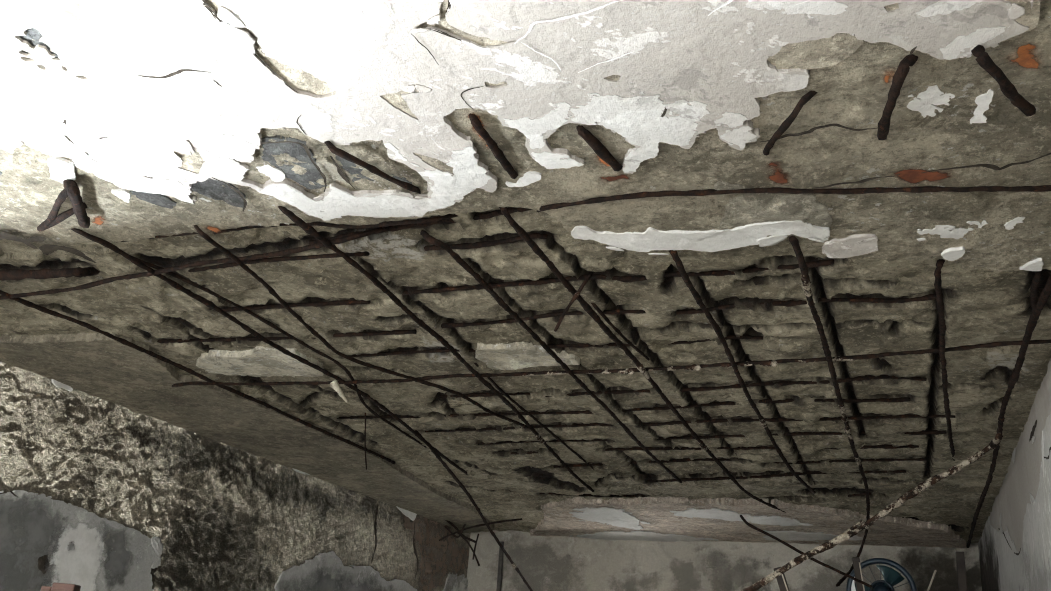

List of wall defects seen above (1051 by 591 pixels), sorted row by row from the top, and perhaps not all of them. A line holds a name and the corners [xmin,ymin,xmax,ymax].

rust [324,141,421,194]
spalling [0,0,1051,368]
rust [576,125,630,182]
rust [877,54,918,140]
rust [971,43,1039,116]
water stain [0,494,133,591]
peeling [0,362,471,591]
water stain [126,428,469,591]
spalling [0,207,1021,532]
rust [0,162,1051,591]
spalling [887,295,1051,552]
crack [1029,420,1051,459]